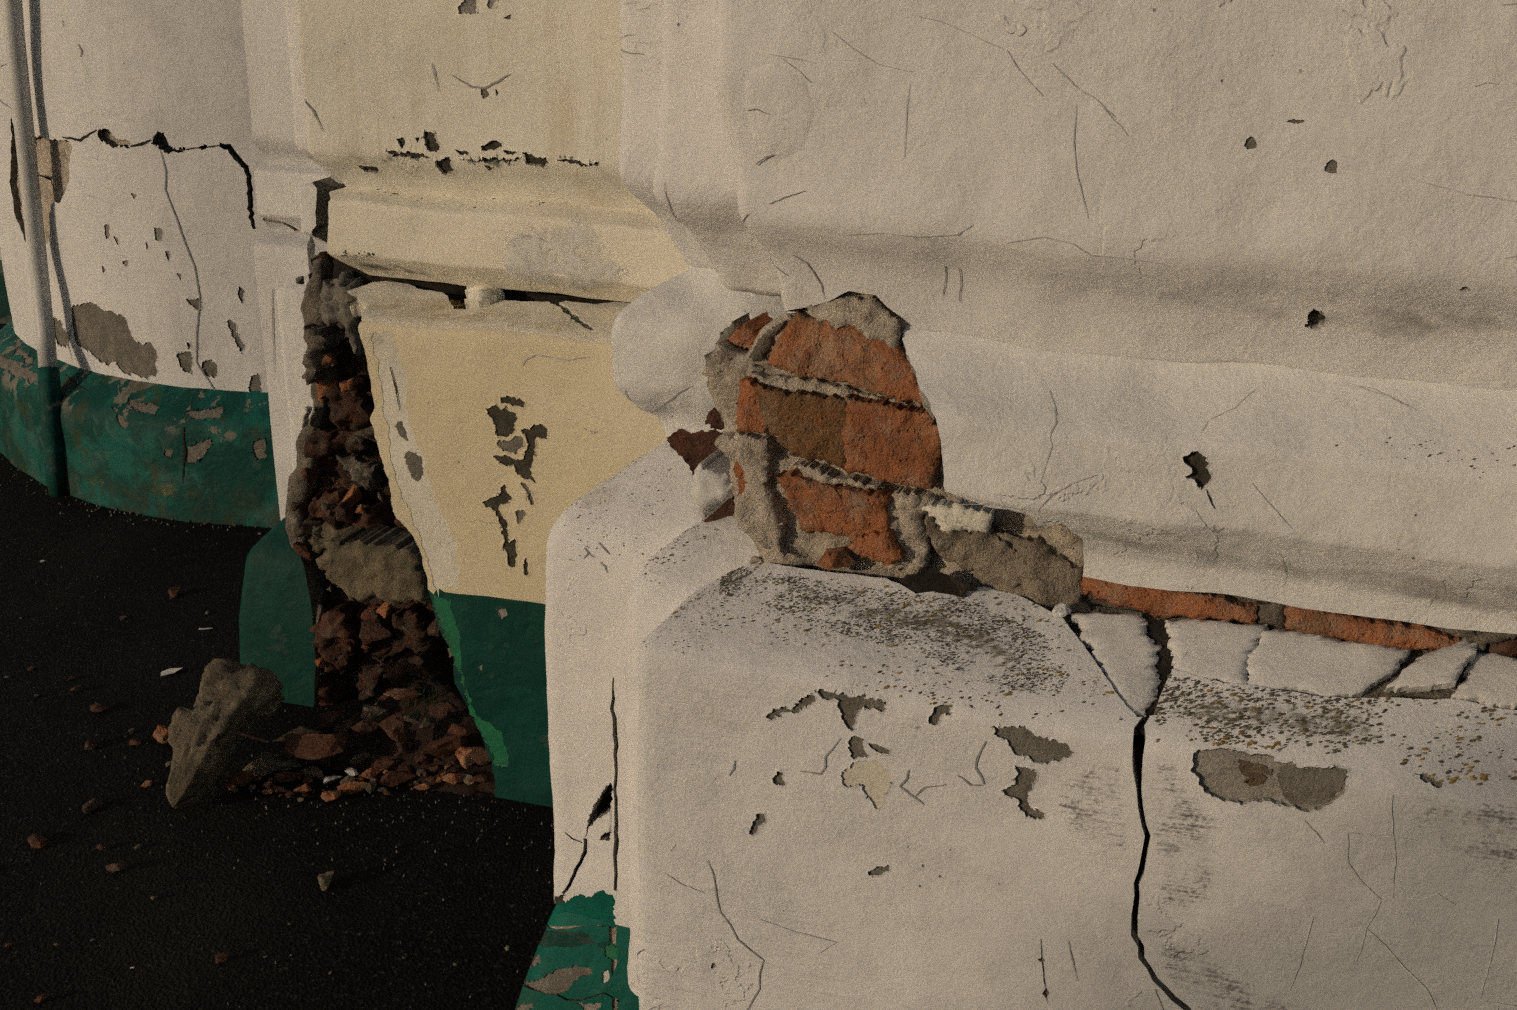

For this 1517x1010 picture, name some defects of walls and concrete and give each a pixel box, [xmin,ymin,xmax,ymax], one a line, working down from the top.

crack [62,130,96,142]
crack [130,139,255,390]
crack [333,235,619,309]
peeling [53,300,219,382]
crack [269,289,277,355]
peeling [480,393,550,578]
spalling [667,291,1517,735]
peeling [763,685,894,811]
peeling [988,722,1078,821]
spalling [1188,745,1354,814]
crack [565,833,619,888]
crack [1133,733,1150,944]